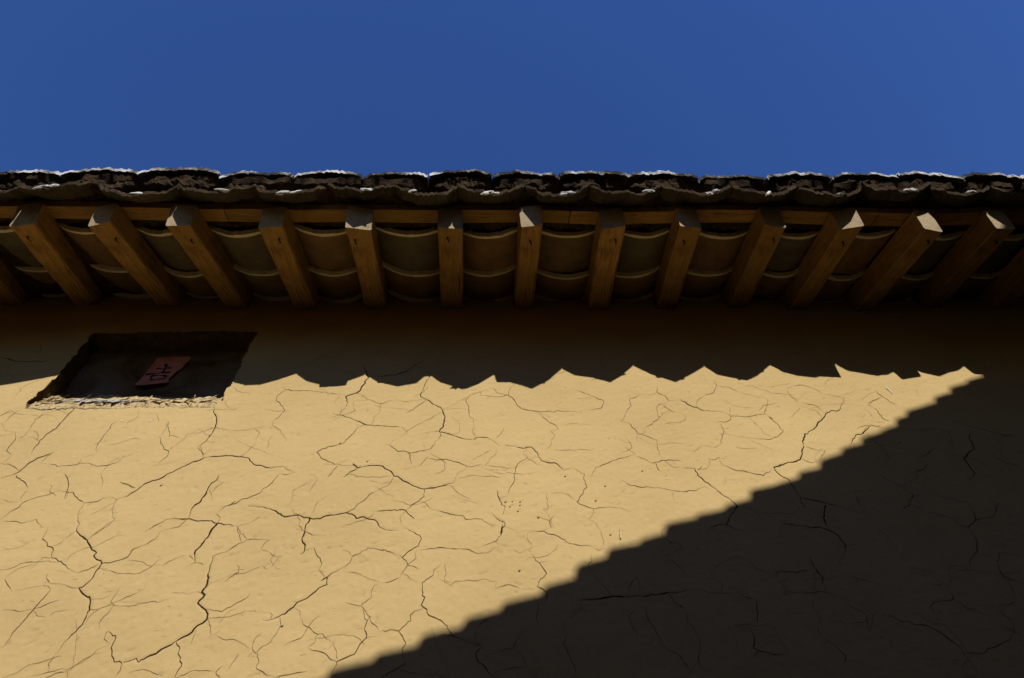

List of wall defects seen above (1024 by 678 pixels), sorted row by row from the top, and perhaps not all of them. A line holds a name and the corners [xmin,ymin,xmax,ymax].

crack [0,332,1022,678]